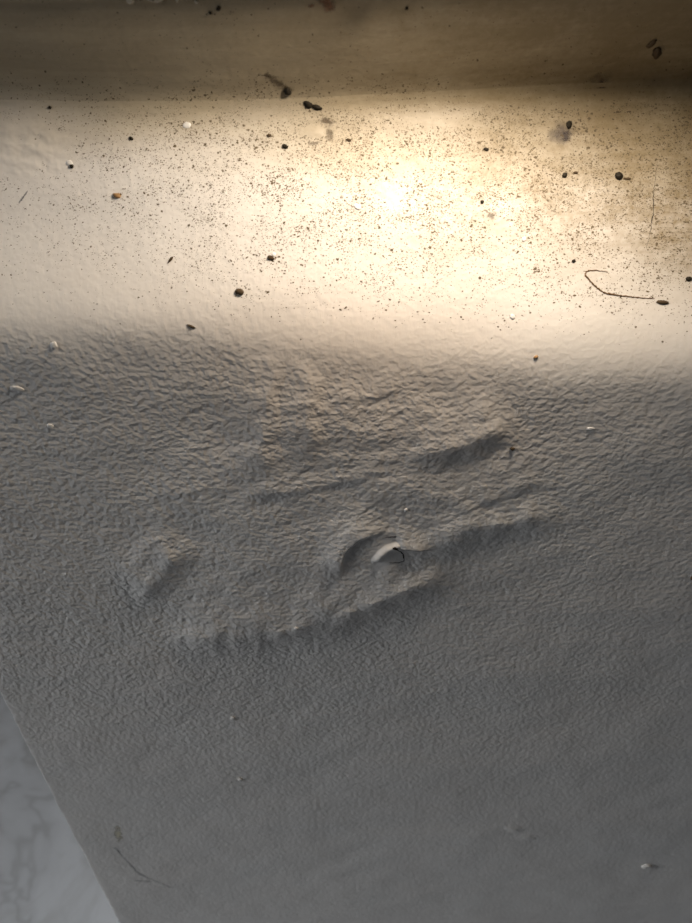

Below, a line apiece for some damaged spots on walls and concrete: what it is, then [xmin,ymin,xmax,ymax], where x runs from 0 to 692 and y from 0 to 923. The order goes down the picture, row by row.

water stain [0,40,692,334]
peeling [308,501,439,582]